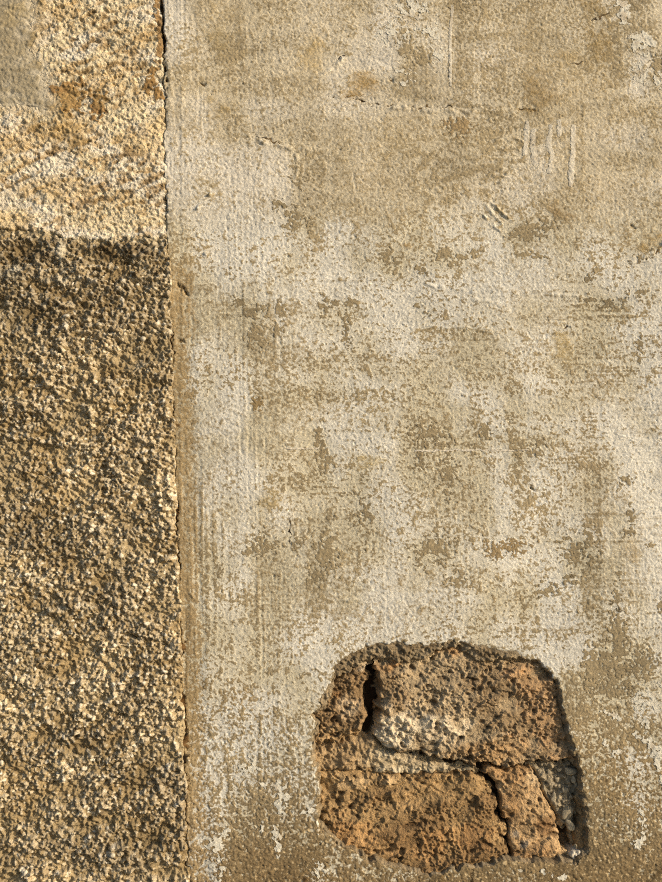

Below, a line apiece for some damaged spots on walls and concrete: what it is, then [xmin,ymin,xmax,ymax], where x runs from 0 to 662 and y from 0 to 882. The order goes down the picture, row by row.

crack [362,664,377,732]
peeling [233,754,263,780]
spalling [259,639,590,882]
crack [409,751,508,847]